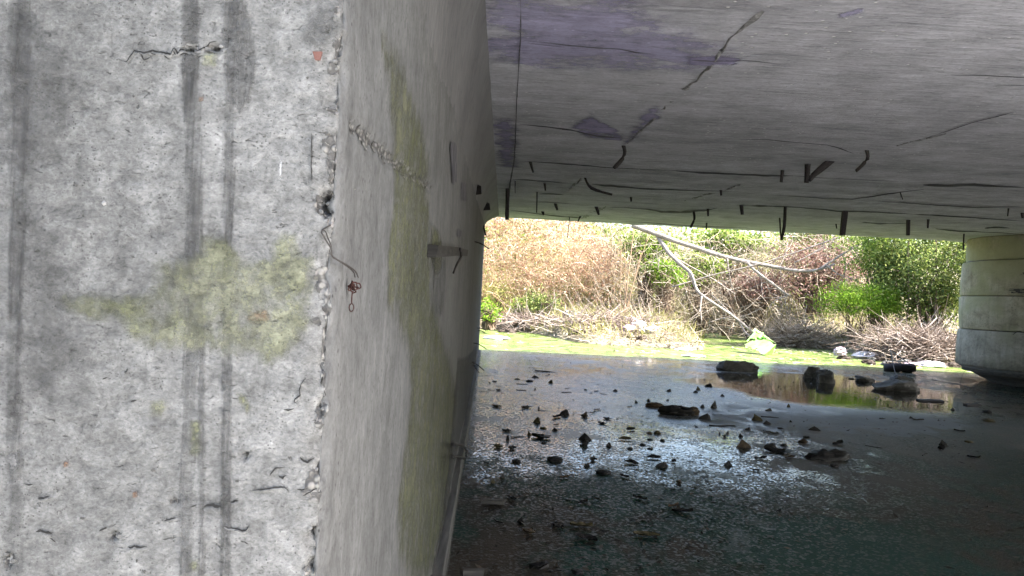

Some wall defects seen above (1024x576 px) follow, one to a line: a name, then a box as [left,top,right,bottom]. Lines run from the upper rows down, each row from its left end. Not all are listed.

crack [119,41,227,66]
leakage [182,2,198,114]
leakage [226,0,255,113]
leakage [486,0,739,69]
spalling [349,122,431,189]
crack [509,1,1024,235]
leakage [186,178,205,458]
leakage [180,492,204,576]
leakage [221,483,230,573]